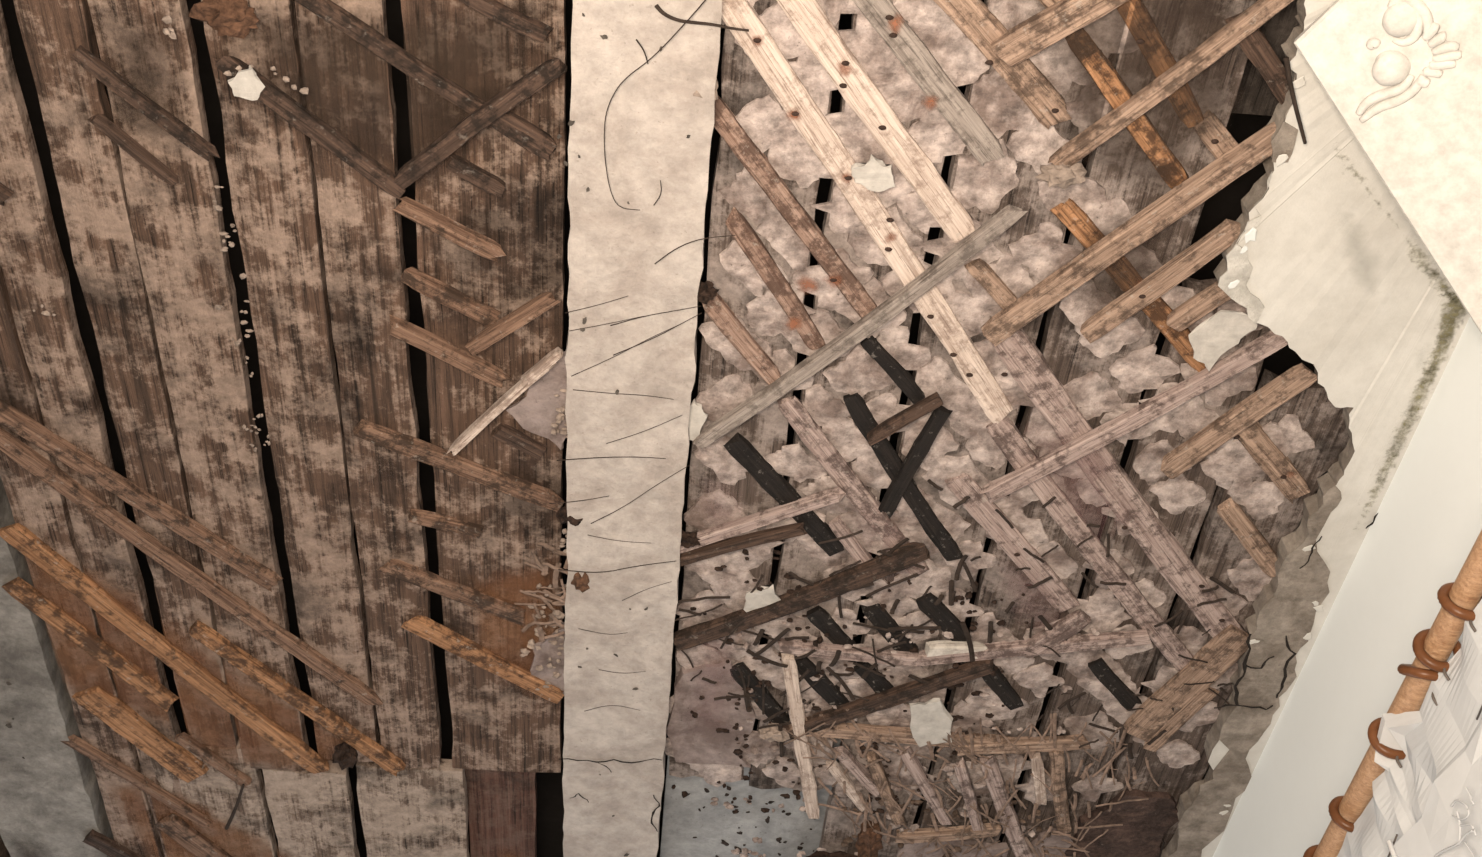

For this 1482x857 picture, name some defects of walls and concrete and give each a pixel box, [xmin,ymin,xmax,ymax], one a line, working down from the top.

spalling [748,0,1135,457]
spalling [664,71,1342,857]